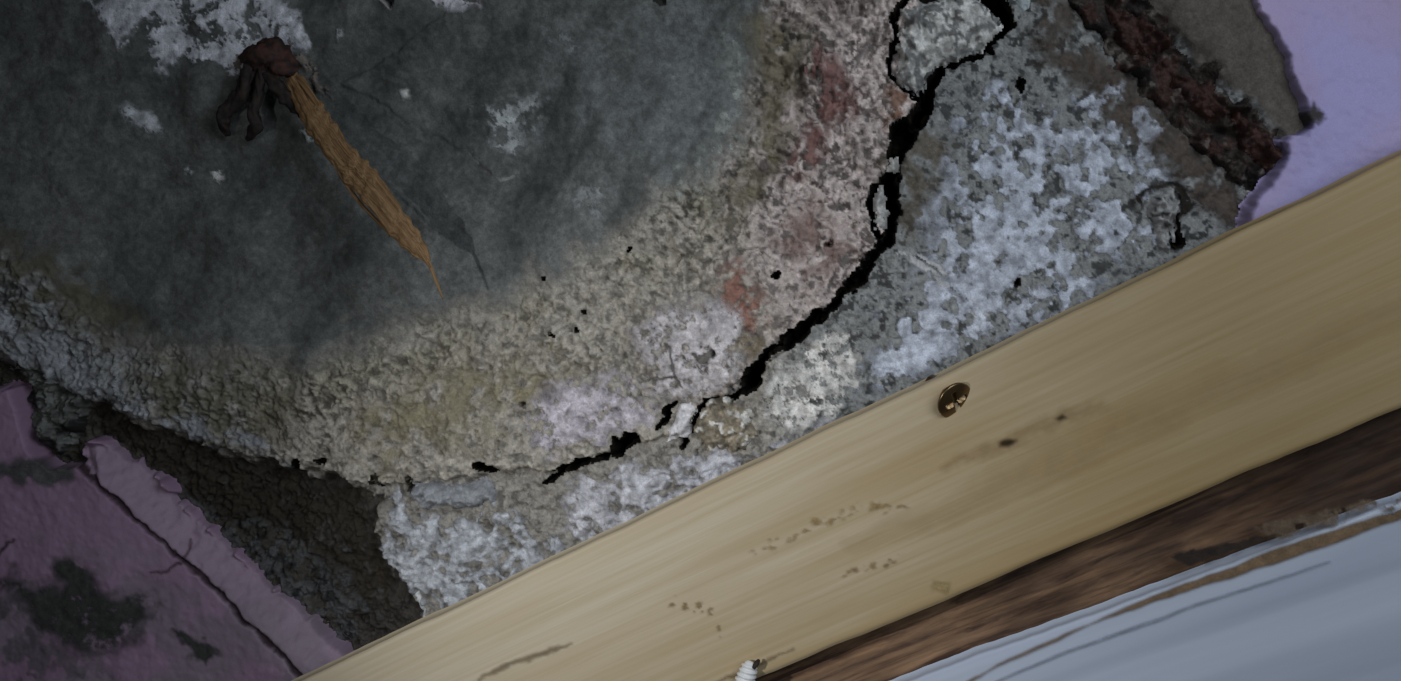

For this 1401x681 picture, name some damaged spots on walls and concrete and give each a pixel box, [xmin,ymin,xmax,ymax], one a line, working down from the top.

leakage [121,104,161,132]
leakage [487,95,542,155]
leakage [676,14,797,204]
crack [542,0,1017,485]
leakage [756,0,1240,458]
spalling [1015,76,1026,94]
spalling [1136,181,1196,255]
spalling [1068,0,1282,191]
spalling [291,458,327,471]
leakage [0,310,743,618]